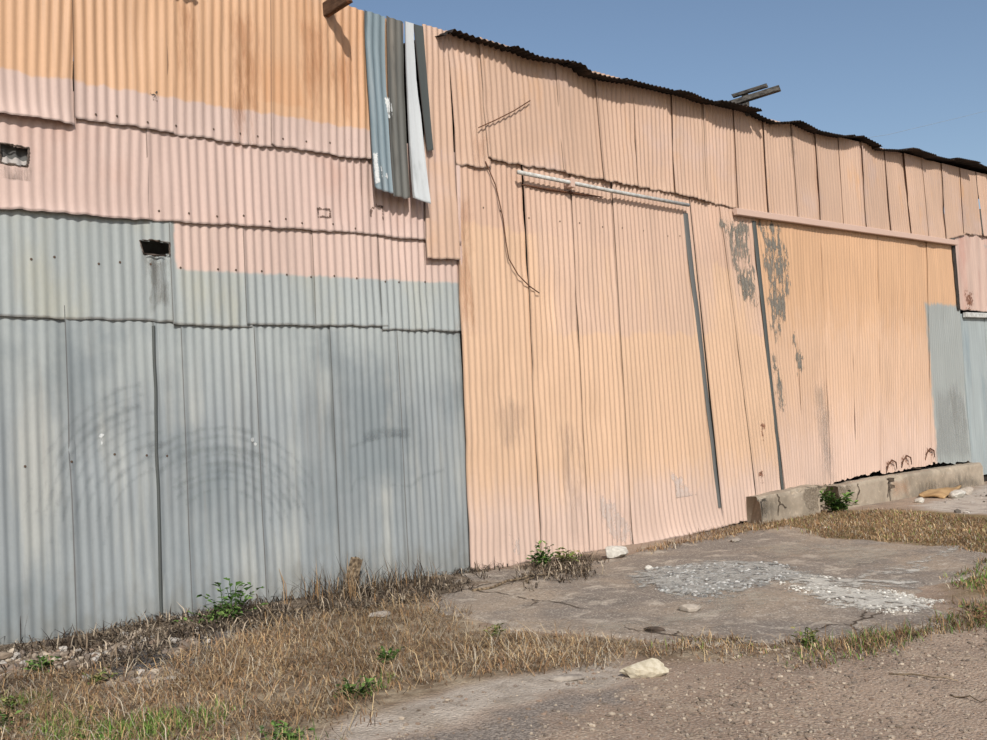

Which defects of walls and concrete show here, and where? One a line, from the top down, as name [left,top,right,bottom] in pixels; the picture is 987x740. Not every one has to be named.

peeling [719,219,791,338]
peeling [772,353,784,409]
peeling [793,331,803,376]
crack [822,611,882,630]